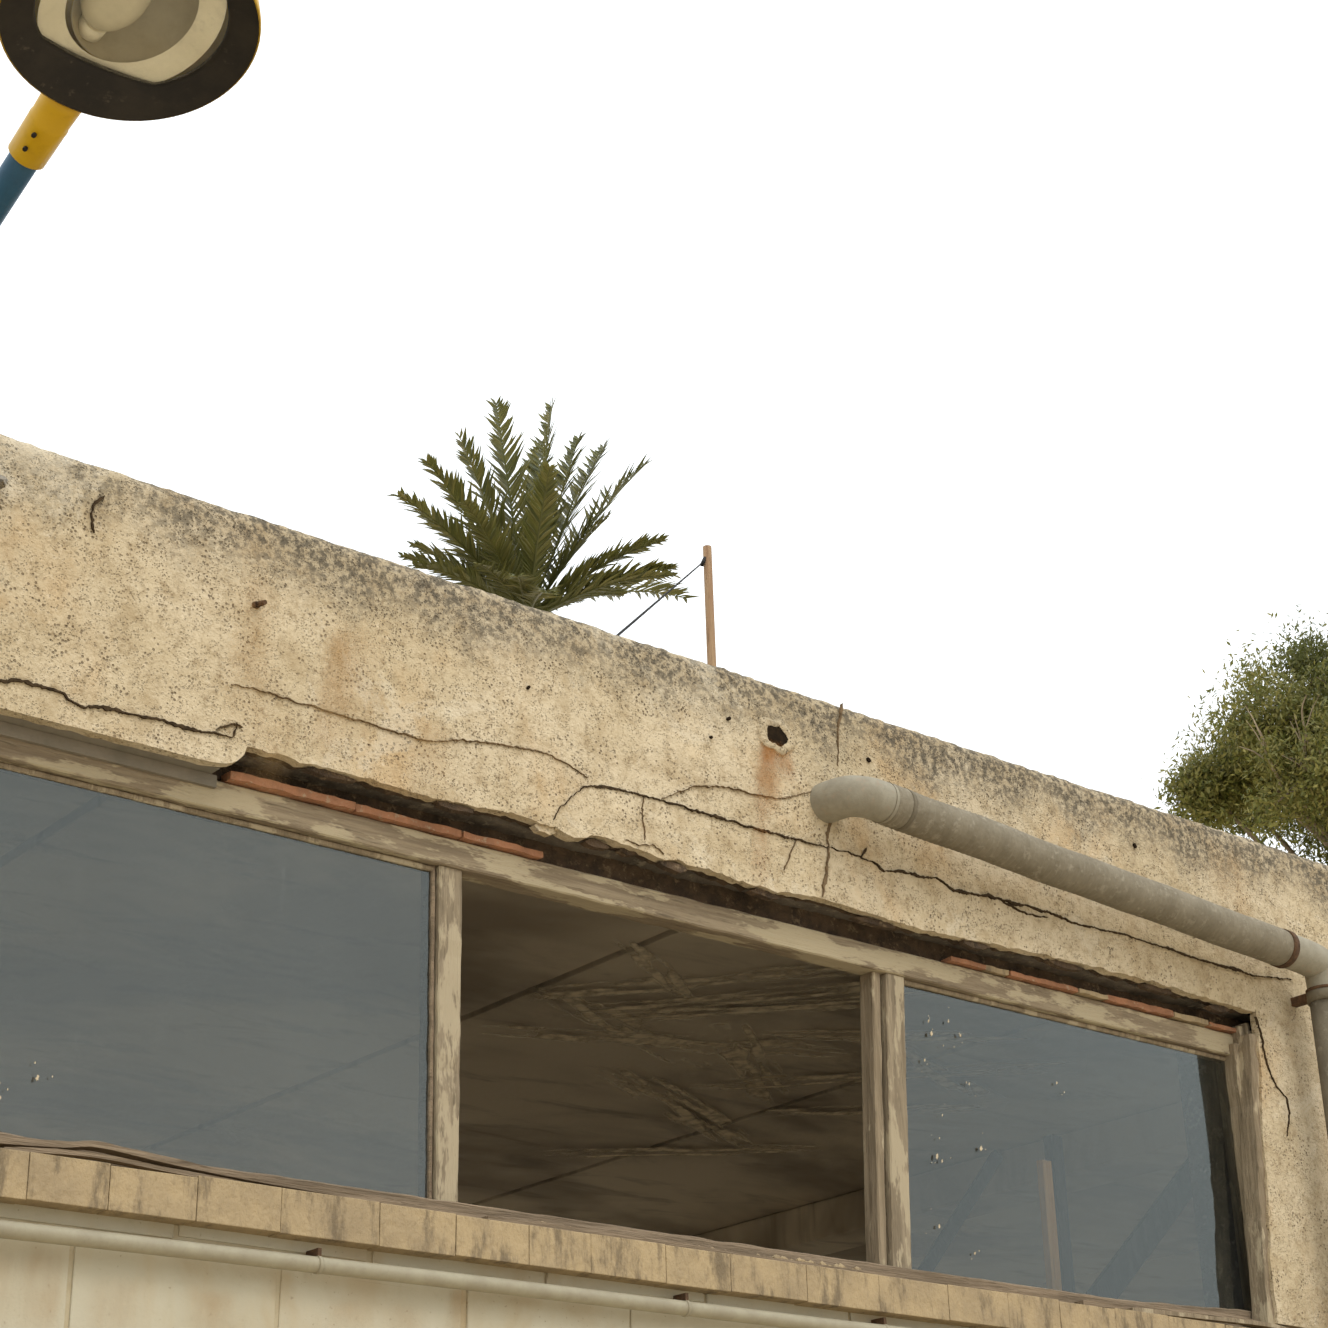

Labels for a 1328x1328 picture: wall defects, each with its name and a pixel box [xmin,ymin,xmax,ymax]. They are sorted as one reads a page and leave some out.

crack [0,678,243,738]
spalling [245,751,1242,1014]
crack [231,684,1292,980]